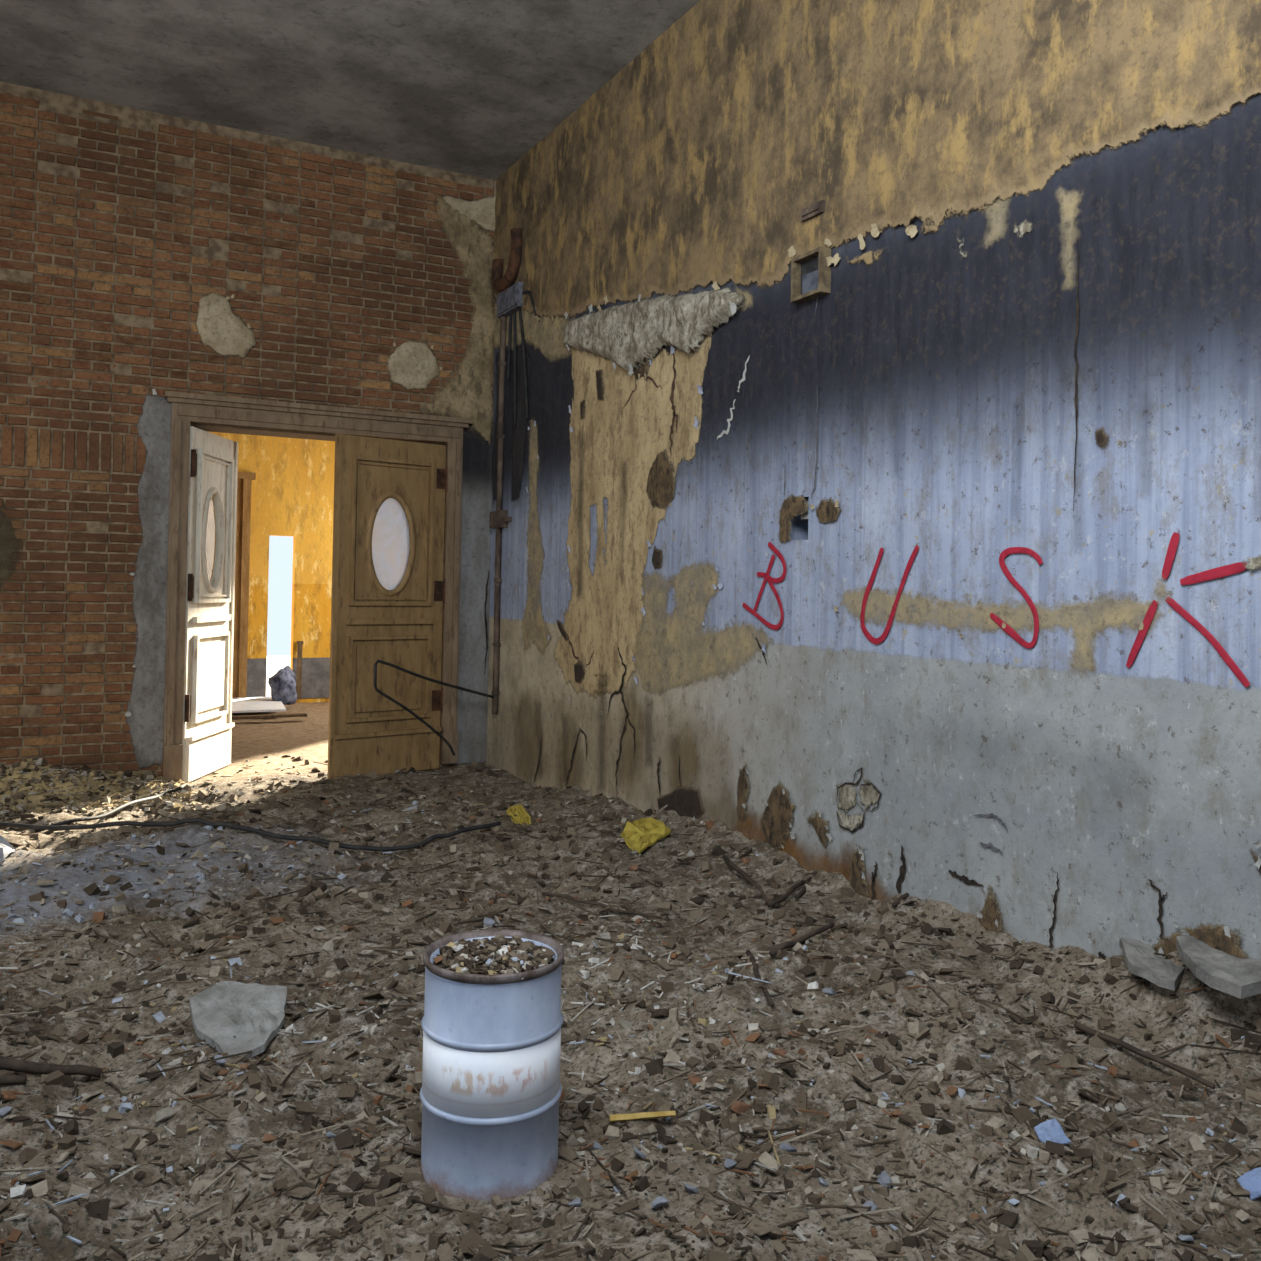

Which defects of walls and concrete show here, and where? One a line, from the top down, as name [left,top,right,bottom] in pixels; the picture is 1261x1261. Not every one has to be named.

flaking render [494,0,1261,699]
spalling [736,763,750,821]
spalling [761,768,881,850]
corrosion [735,815,851,881]
spalling [848,847,869,897]
spalling [1250,840,1261,873]